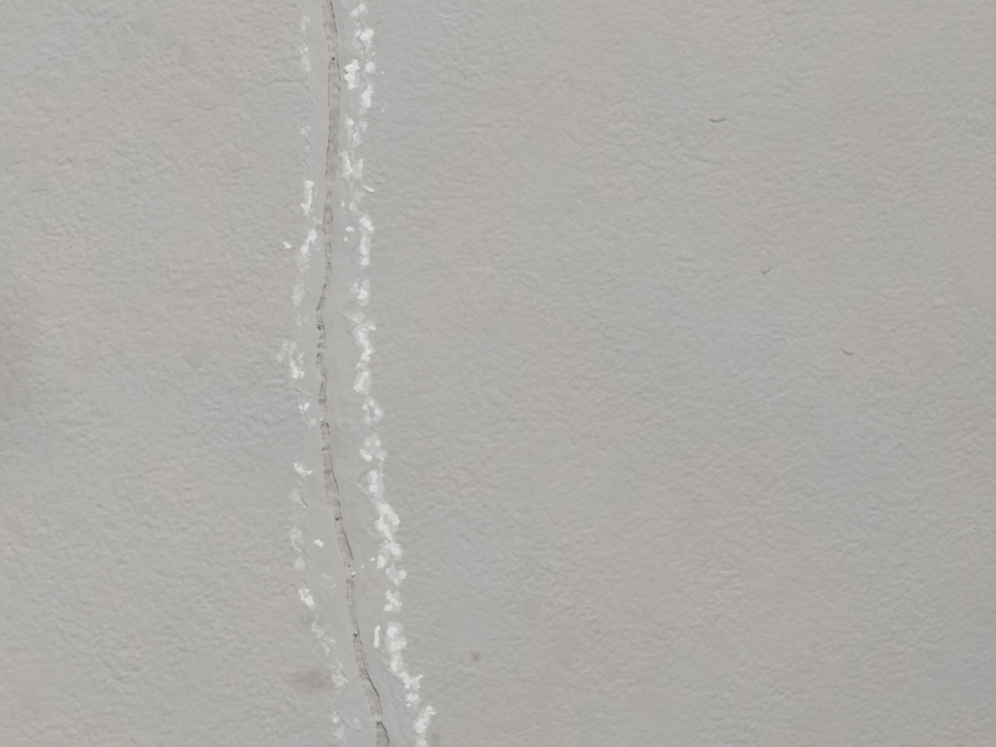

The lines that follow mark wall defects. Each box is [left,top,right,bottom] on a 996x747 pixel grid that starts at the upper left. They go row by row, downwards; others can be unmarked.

crack [315,0,390,747]